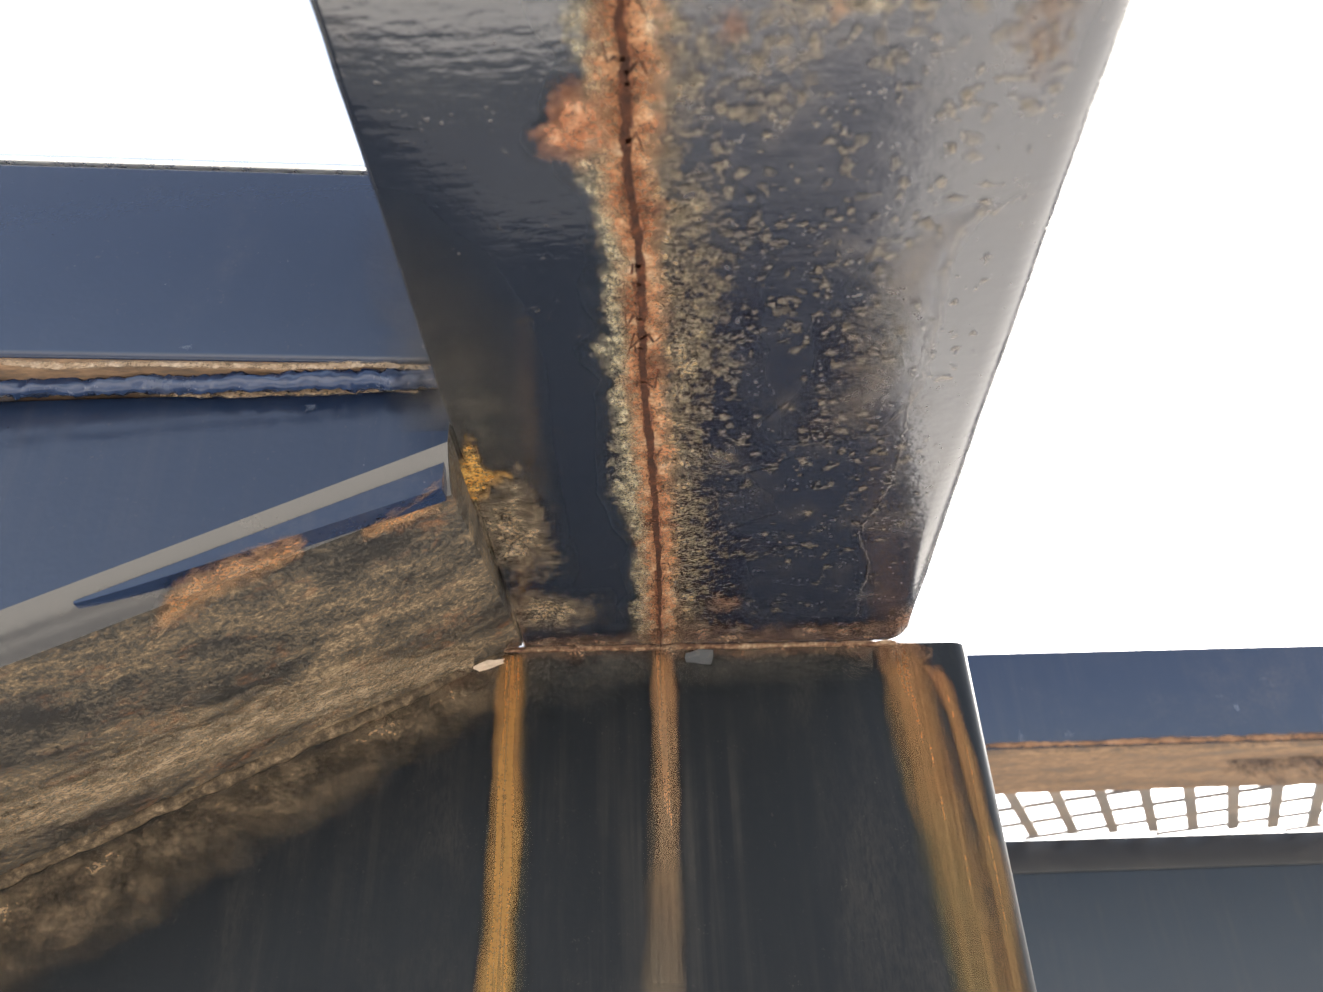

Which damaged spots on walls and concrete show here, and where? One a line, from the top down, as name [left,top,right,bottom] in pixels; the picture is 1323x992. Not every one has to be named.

corrosion [536,92,613,153]
peeling [0,359,429,370]
peeling [159,388,418,398]
corrosion [460,446,509,500]
corrosion [366,497,435,538]
corrosion [161,539,304,624]
corrosion [446,609,1323,992]